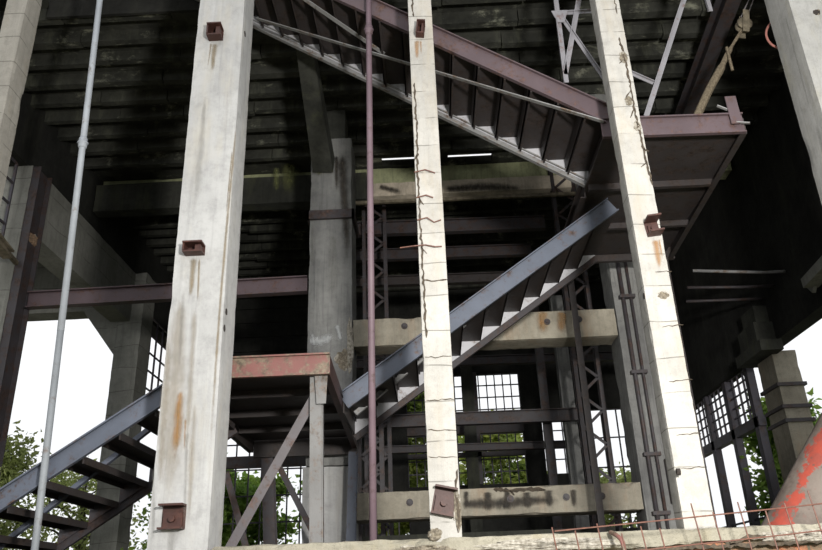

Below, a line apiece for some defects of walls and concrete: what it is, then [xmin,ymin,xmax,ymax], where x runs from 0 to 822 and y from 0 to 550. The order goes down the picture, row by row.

crack [618,38,653,185]
crack [413,83,449,358]
rust [174,394,186,445]
crack [428,456,460,533]